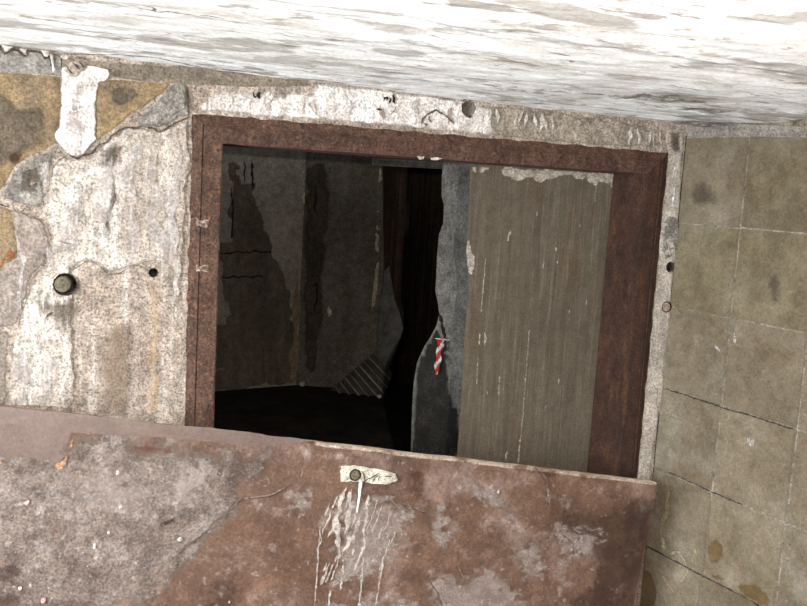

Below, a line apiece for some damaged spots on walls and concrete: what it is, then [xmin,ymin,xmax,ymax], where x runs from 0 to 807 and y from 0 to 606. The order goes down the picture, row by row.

crack [76,54,254,73]
water stain [0,96,44,164]
crack [51,87,190,178]
spalling [139,84,188,127]
water stain [304,163,329,372]
peeling [0,154,315,606]
crack [653,384,795,430]
crack [646,546,759,606]